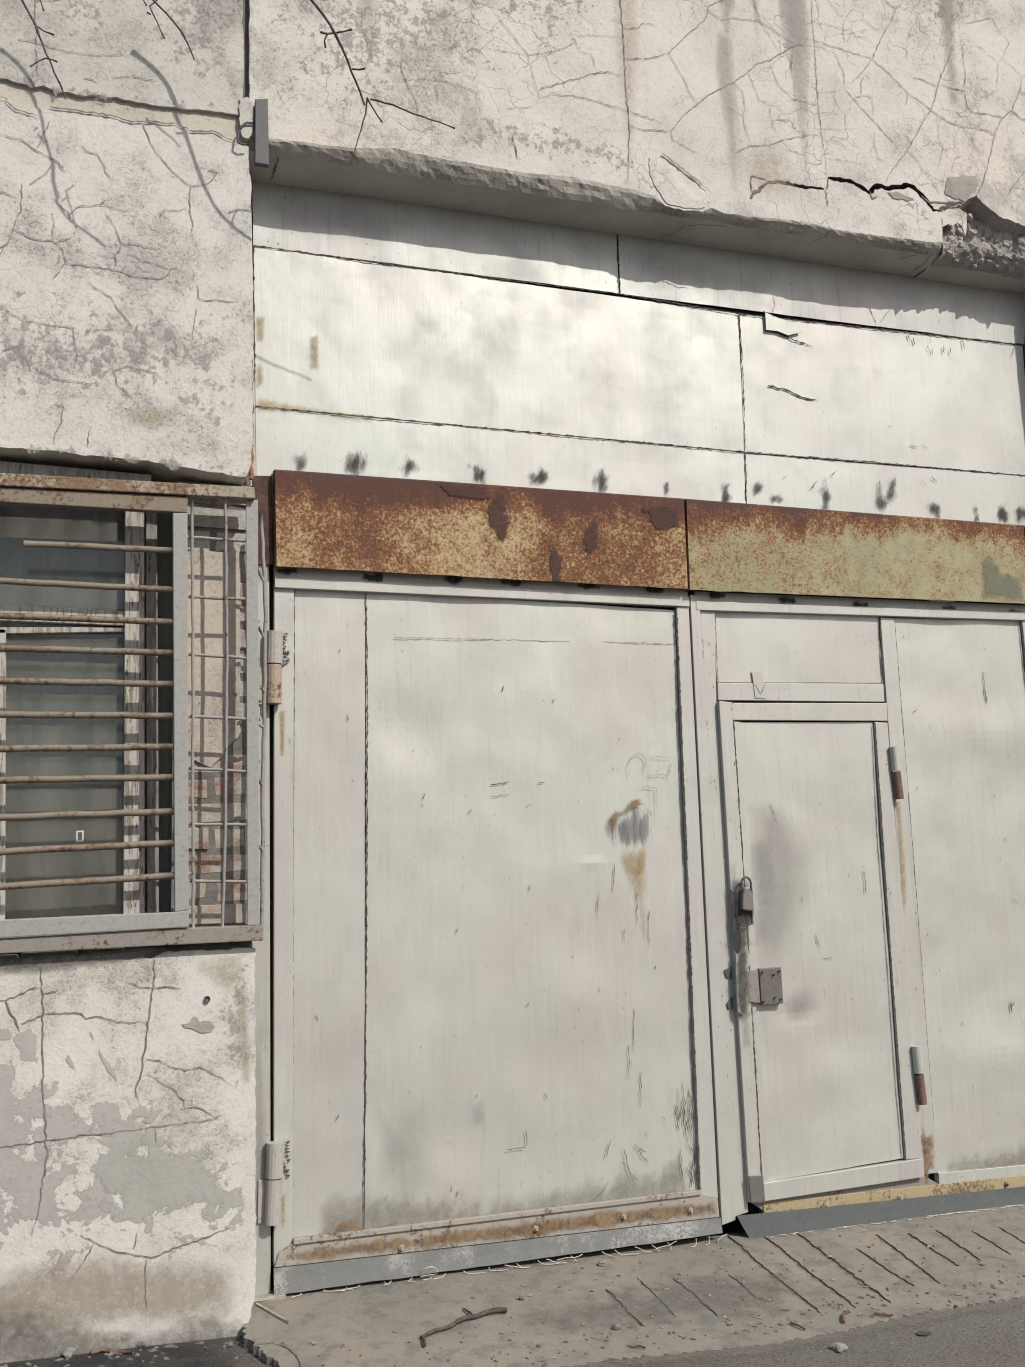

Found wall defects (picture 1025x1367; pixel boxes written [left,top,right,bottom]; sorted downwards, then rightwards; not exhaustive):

leakage [782,0,804,69]
crack [400,0,1025,243]
crack [0,0,238,444]
spalling [930,175,1025,280]
corrosion [441,483,510,541]
corrosion [644,506,679,530]
corrosion [609,800,642,832]
peeling [182,1016,215,1033]
crack [0,959,232,1232]
peeling [0,1028,242,1319]
crack [74,1227,231,1308]
corrosion [298,1205,715,1259]